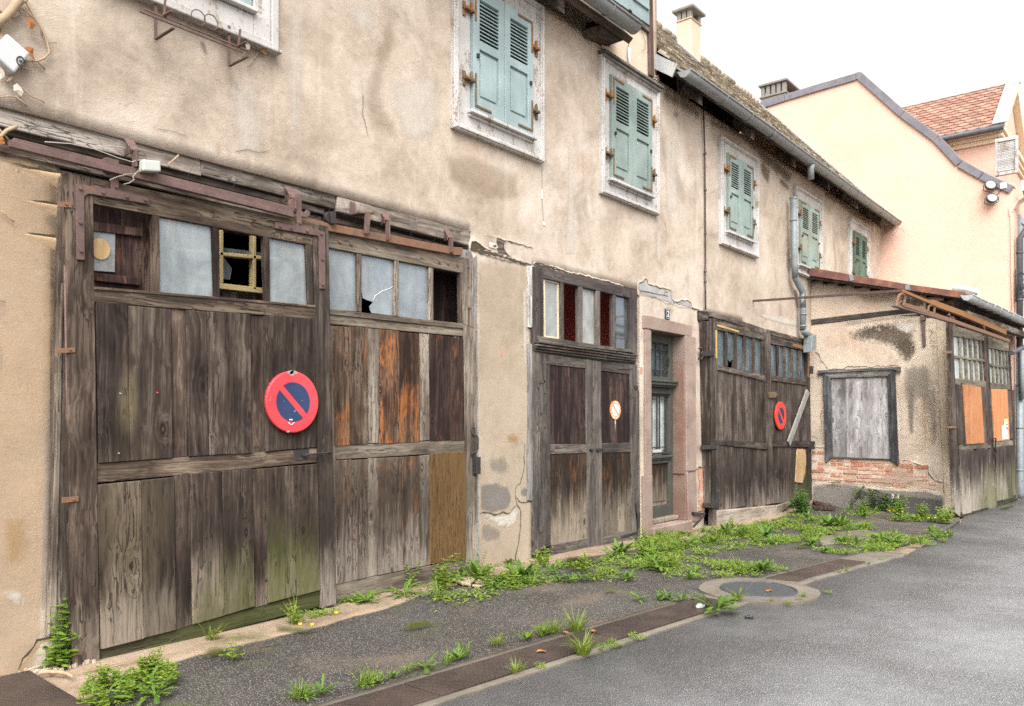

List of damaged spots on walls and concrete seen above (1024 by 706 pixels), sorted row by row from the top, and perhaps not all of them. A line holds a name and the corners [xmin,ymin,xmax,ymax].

flaking render [469,235,512,264]
flaking render [637,276,692,309]
leakage [854,321,928,427]
flaking render [811,445,944,491]
crack [481,452,532,561]